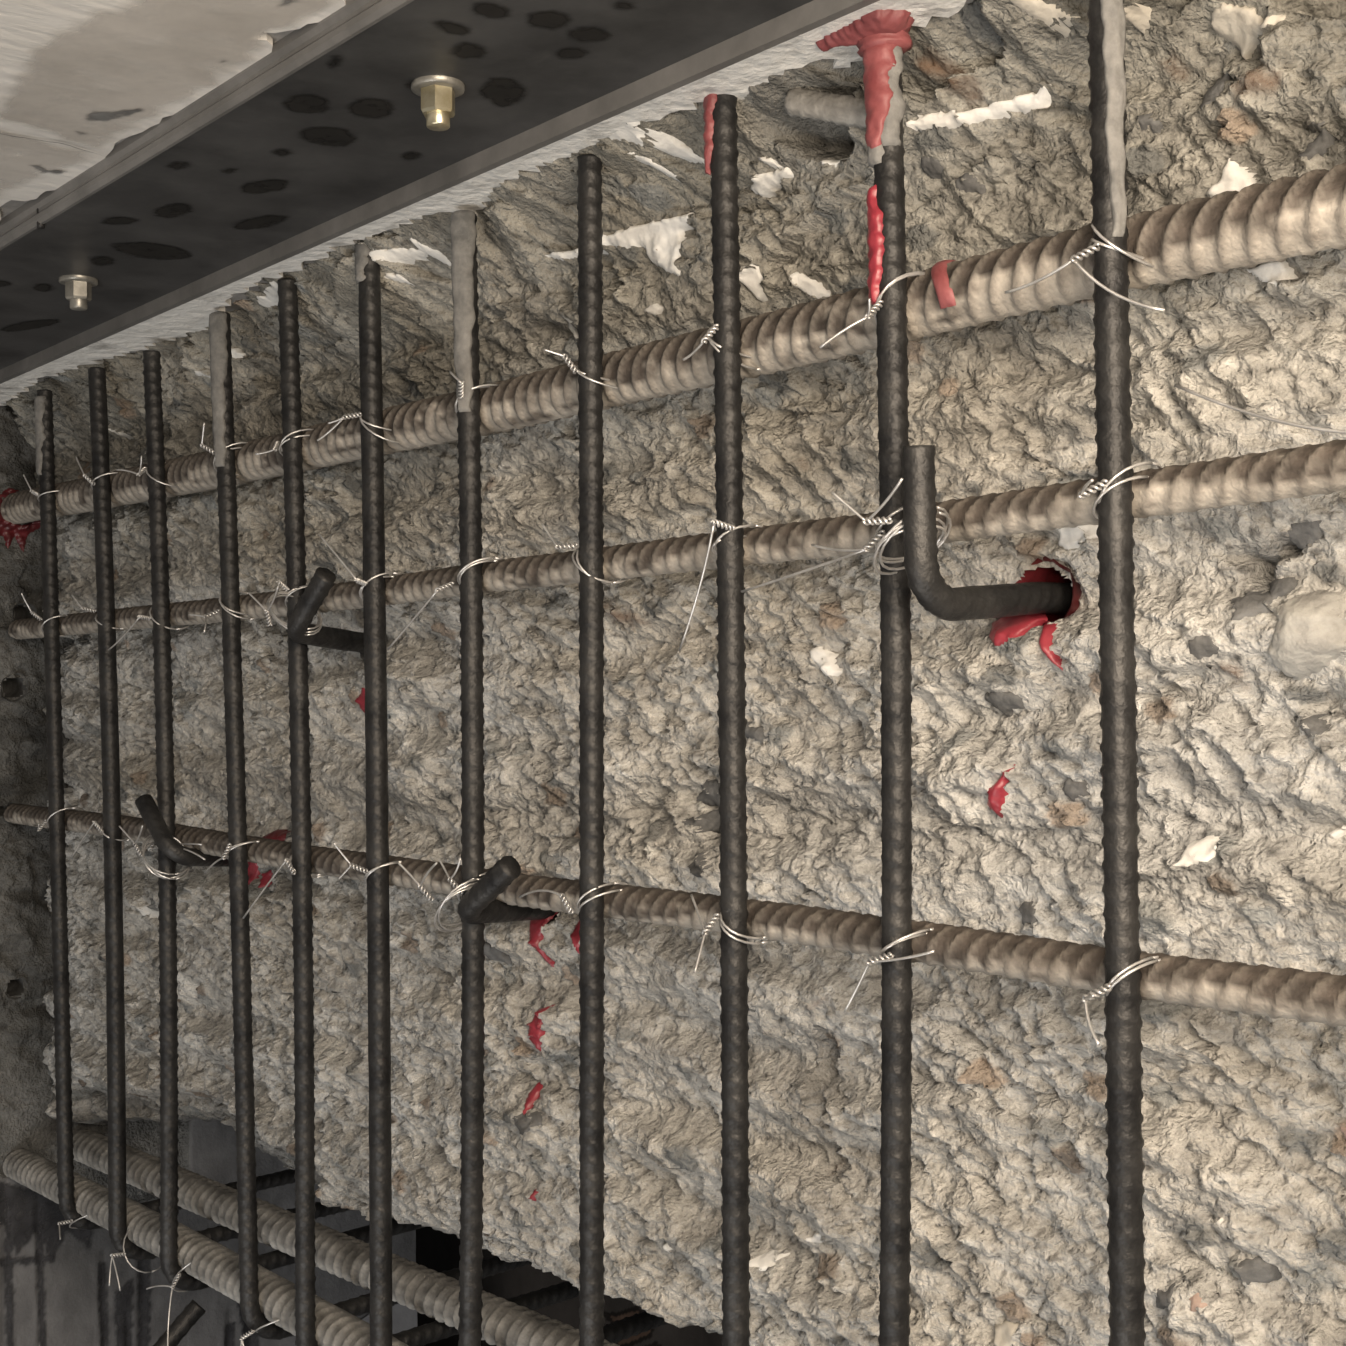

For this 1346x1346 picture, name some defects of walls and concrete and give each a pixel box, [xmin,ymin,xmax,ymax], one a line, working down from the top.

spalling [739,59,866,198]
flaking render [906,84,1052,132]
spalling [1126,121,1346,290]
spalling [739,263,877,380]
spalling [906,223,1094,341]
spalling [1132,439,1346,518]
spalling [0,405,108,1230]
spalling [912,901,1105,994]
spalling [1140,951,1346,1027]
leakage [0,1183,92,1346]
leakage [98,1259,151,1346]
leakage [224,1303,258,1346]